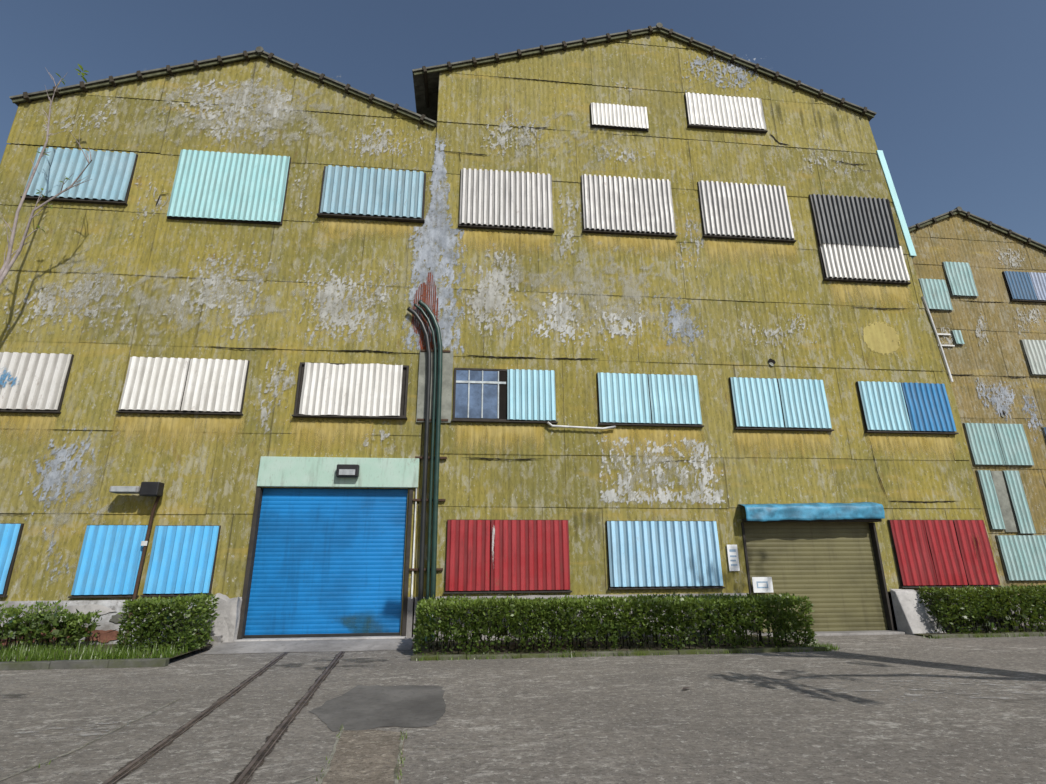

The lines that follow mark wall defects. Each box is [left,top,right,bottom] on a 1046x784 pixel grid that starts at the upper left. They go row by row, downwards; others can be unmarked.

peeling [44,98,116,131]
peeling [151,75,709,359]
peeling [3,242,280,342]
rust [411,272,439,350]
peeling [976,378,1042,442]
peeling [20,422,109,579]
peeling [597,435,729,508]